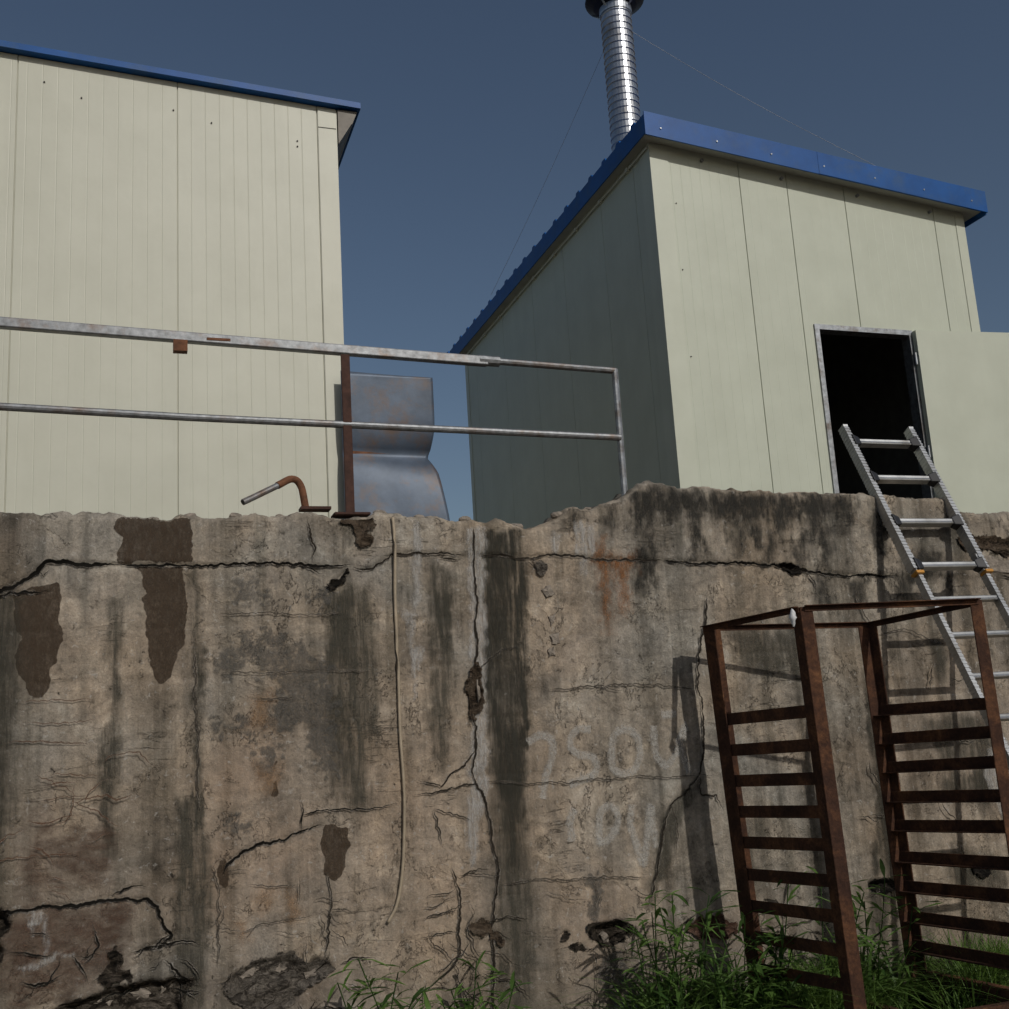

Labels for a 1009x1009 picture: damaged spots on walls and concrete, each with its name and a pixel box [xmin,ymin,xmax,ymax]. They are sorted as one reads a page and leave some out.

water stain [0,582,63,718]
water stain [114,517,198,684]
water stain [212,575,377,807]
spalling [465,662,486,721]
peeling [957,534,1009,574]
crack [0,520,942,1009]
water stain [468,529,535,1009]
water stain [177,725,229,1008]
water stain [320,824,351,881]
spalling [56,945,195,1009]
spalling [222,950,336,1009]
spalling [561,918,635,952]